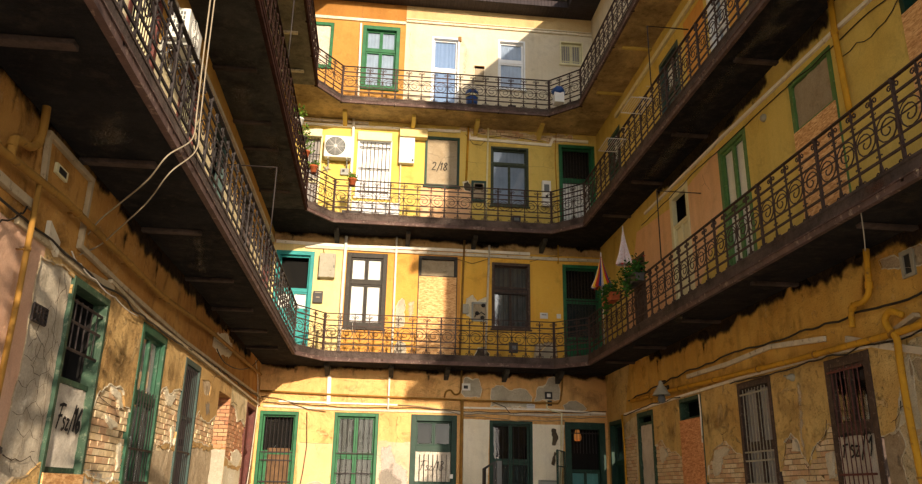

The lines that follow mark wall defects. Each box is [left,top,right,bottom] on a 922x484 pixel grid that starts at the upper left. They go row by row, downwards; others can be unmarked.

crack [2,281,68,471]
flaking render [83,383,130,484]
flaking render [148,386,182,484]
flaking render [188,404,244,484]
peeling [213,332,233,359]
peeling [380,446,407,484]
flaking render [461,376,587,411]
flaking render [707,441,746,484]
flaking render [781,423,839,484]
peeling [897,353,922,456]